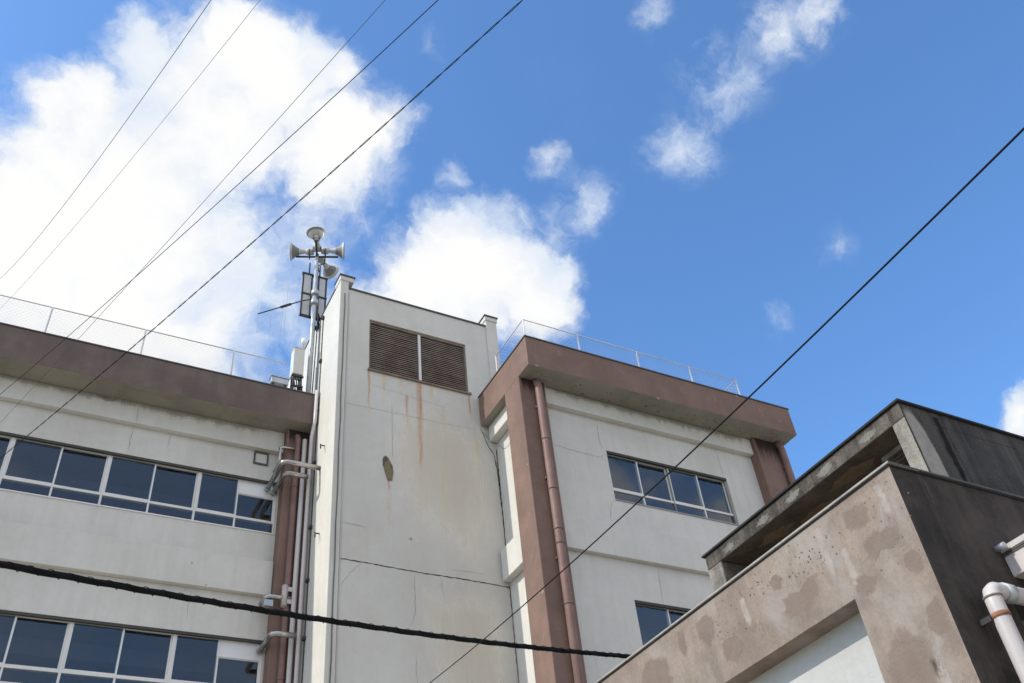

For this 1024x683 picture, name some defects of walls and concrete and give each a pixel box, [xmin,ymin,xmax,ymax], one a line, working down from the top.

water stain [904,411,967,505]
water stain [814,528,858,585]